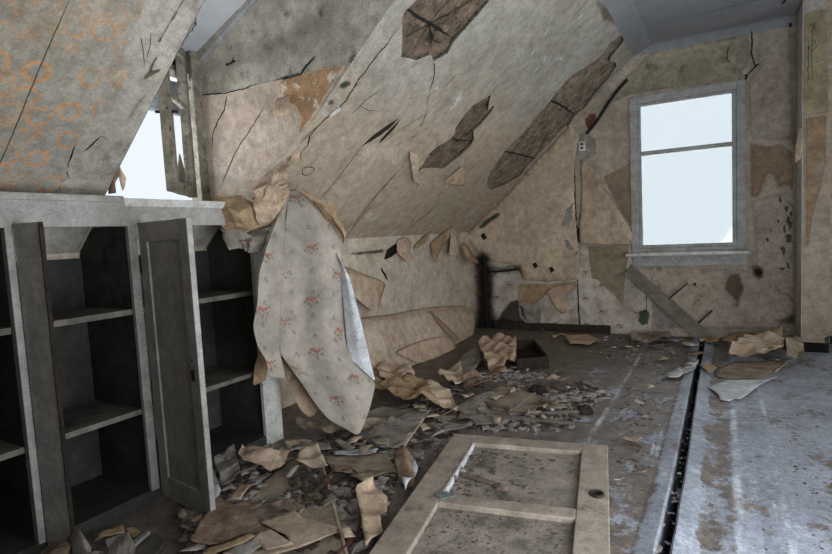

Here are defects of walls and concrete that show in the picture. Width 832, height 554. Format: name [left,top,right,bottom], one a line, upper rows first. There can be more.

spalling [398,0,492,65]
crack [726,31,760,80]
crack [807,24,817,83]
peeling [278,66,343,134]
crack [300,28,399,176]
spalling [412,92,497,176]
spalling [485,34,624,191]
peeling [803,0,829,245]
peeling [612,26,795,328]
damp [726,274,743,300]